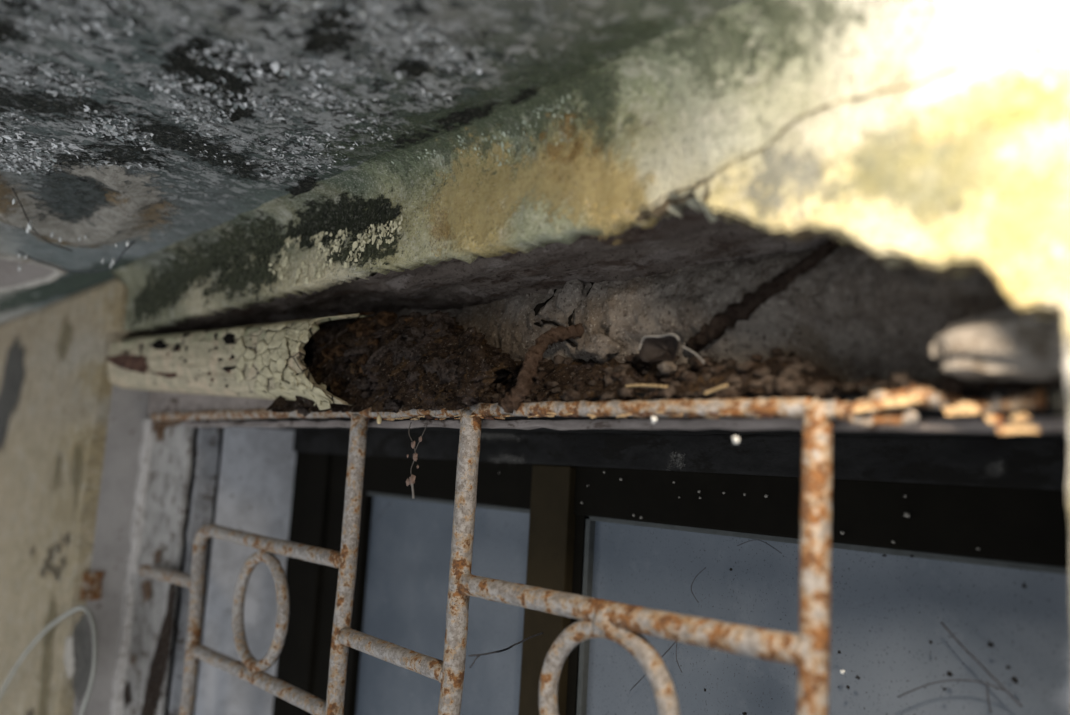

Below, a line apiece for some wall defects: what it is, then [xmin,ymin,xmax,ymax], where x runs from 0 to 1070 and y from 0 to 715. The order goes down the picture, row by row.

mould [0,0,60,46]
mould [149,34,294,124]
mould [293,2,365,61]
mould [392,56,443,80]
mould [391,87,540,149]
crack [678,45,1070,195]
mould [0,83,404,333]
damp [741,116,1065,227]
flaking render [0,253,68,293]
flaking render [107,178,1066,410]